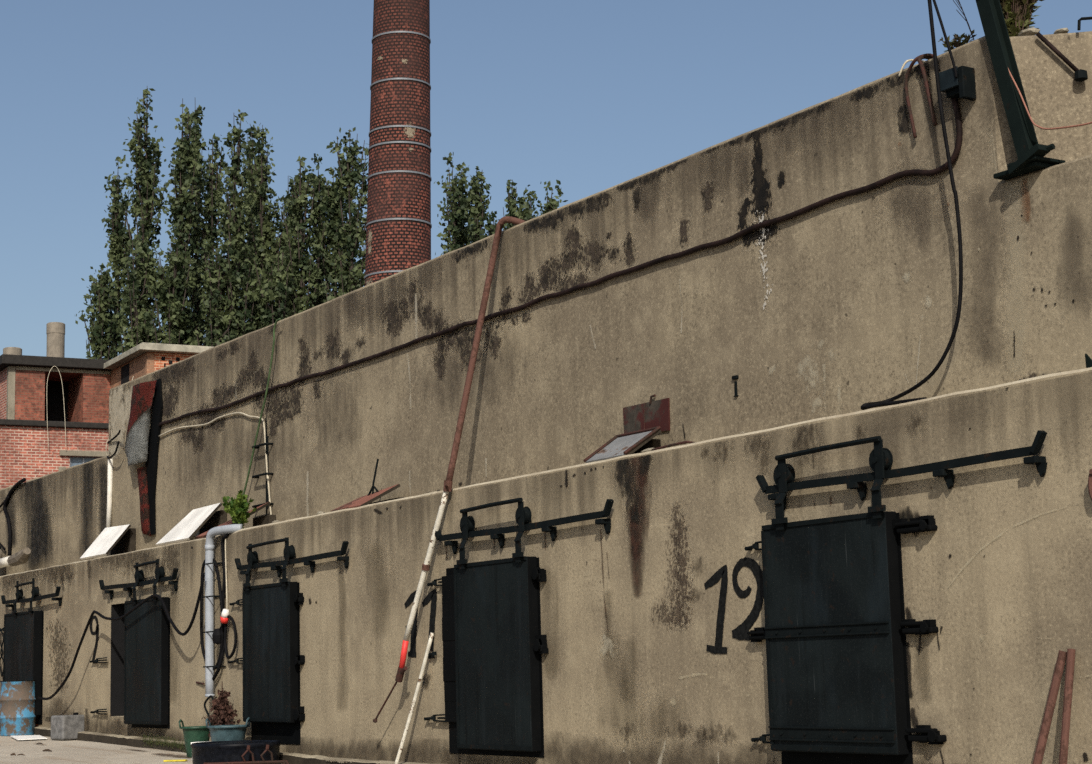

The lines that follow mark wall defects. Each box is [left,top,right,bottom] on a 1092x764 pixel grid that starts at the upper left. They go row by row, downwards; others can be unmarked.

water stain [680,220,689,247]
water stain [701,180,714,212]
water stain [704,101,832,310]
water stain [380,225,636,378]
water stain [154,357,196,421]
water stain [181,329,366,454]
corrosion [629,456,650,595]